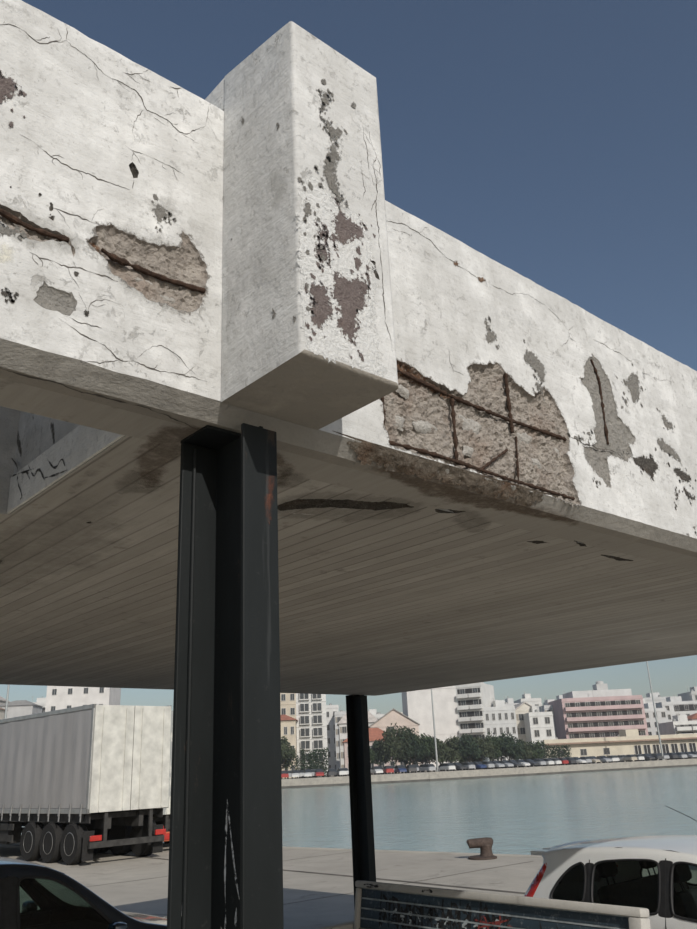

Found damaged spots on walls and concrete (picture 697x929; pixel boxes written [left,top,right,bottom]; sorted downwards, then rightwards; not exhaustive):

peeling [0,70,27,128]
crack [0,18,217,190]
peeling [1,288,19,303]
spalling [0,202,75,256]
spalling [33,281,89,316]
crack [30,252,204,381]
spalling [86,194,212,316]
spalling [293,79,696,510]
crack [362,128,671,382]
spalling [278,499,413,515]